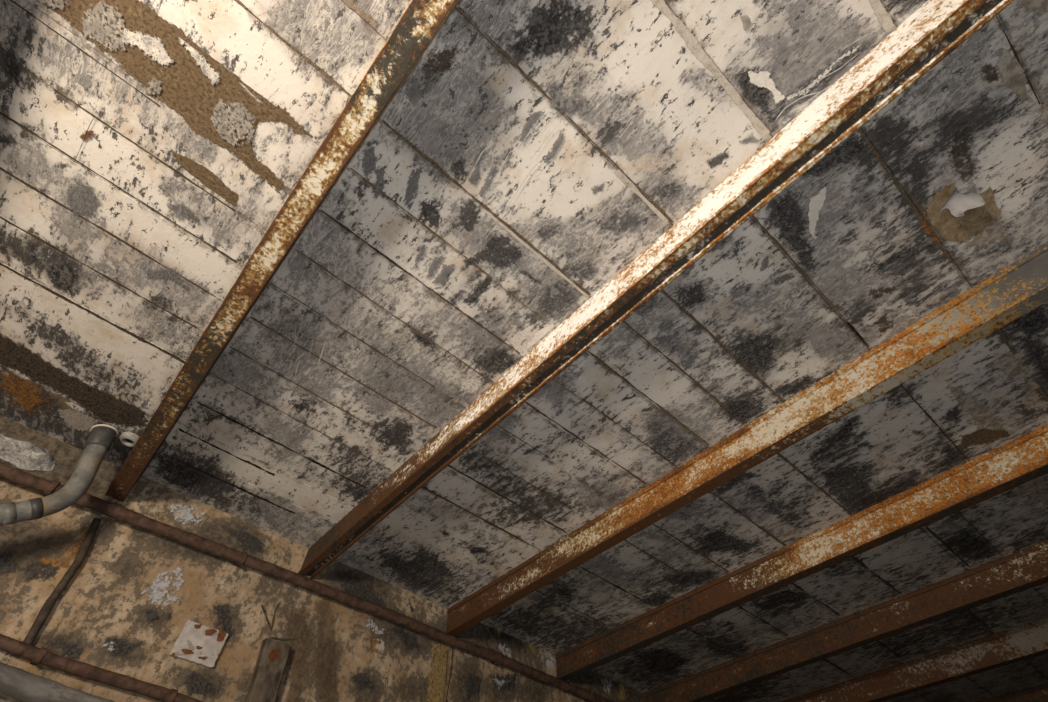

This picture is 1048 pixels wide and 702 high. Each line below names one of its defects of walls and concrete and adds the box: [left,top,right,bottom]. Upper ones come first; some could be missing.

water stain [506,0,594,58]
peeling [35,0,304,193]
water stain [520,83,591,163]
peeling [747,70,785,104]
water stain [735,41,874,122]
peeling [171,151,239,206]
water stain [404,168,442,232]
water stain [451,145,498,232]
water stain [707,152,729,168]
water stain [803,134,867,179]
flaking render [921,183,1008,248]
water stain [413,233,597,318]